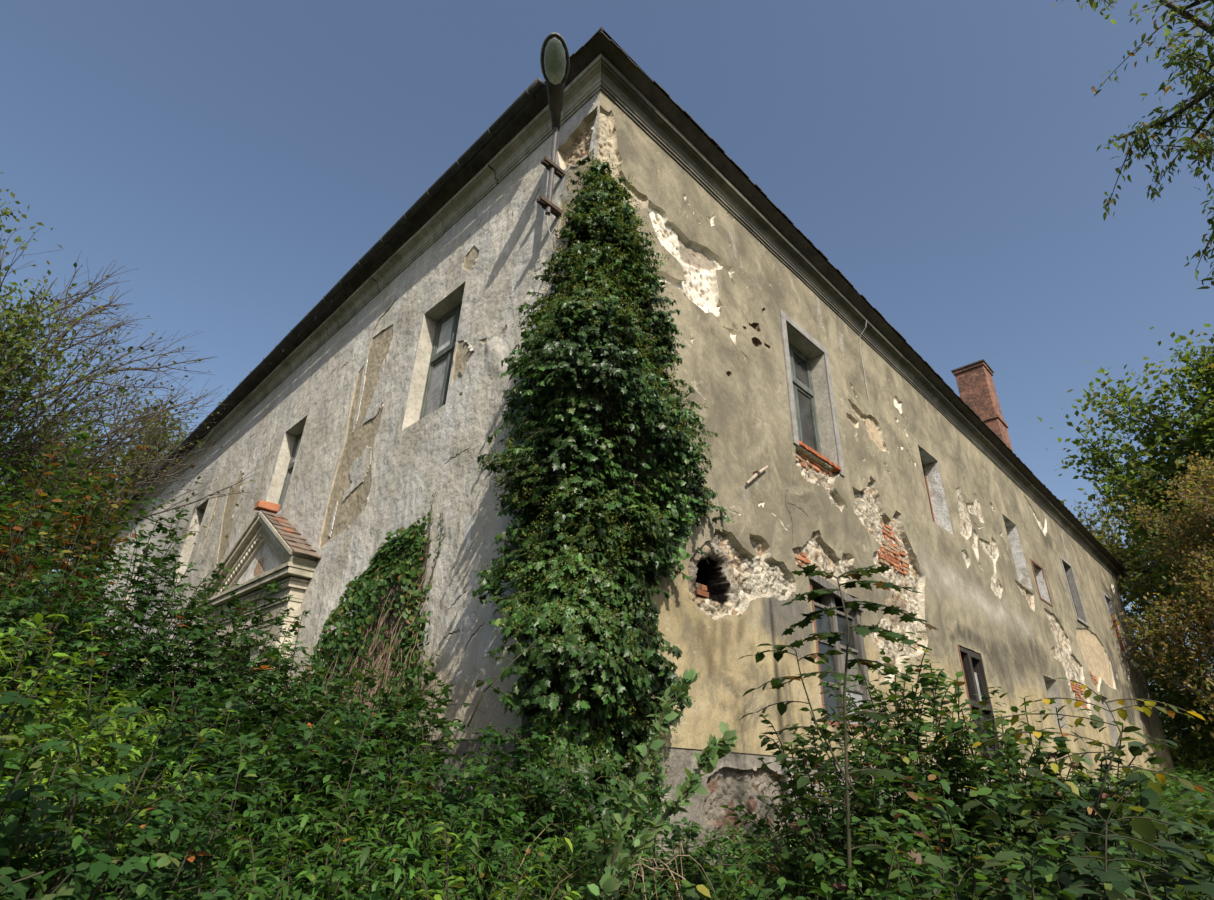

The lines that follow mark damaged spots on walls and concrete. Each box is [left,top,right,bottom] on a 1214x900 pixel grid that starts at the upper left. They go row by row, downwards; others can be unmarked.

flaking render [554,105,770,350]
flaking render [844,382,916,473]
spalling [688,527,855,620]
flaking render [795,446,929,683]
flaking render [956,487,1140,717]